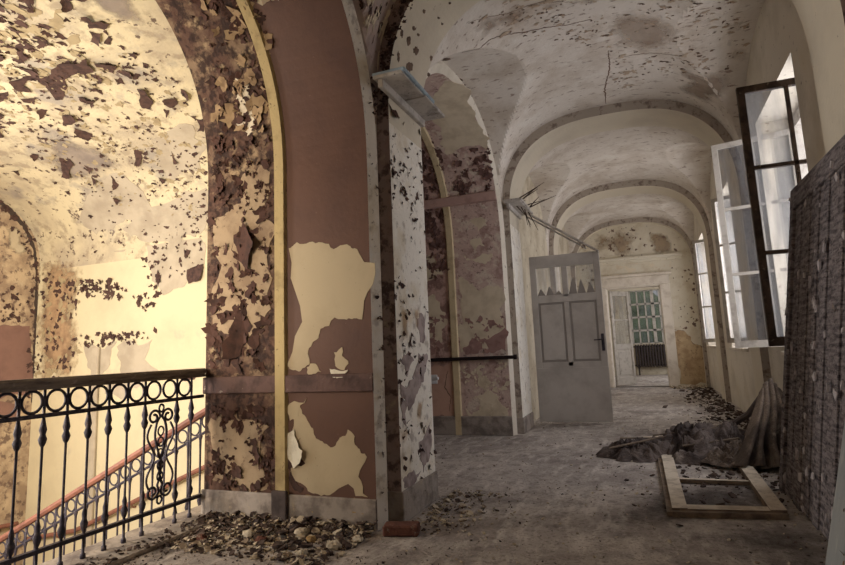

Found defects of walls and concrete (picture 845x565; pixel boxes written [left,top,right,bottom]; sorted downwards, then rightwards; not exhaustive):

peeling [359,0,420,125]
peeling [0,0,274,381]
flaking render [389,78,493,282]
flaking render [288,242,379,378]
peeling [0,391,30,417]
flaking render [105,382,145,400]
flaking render [393,276,511,488]